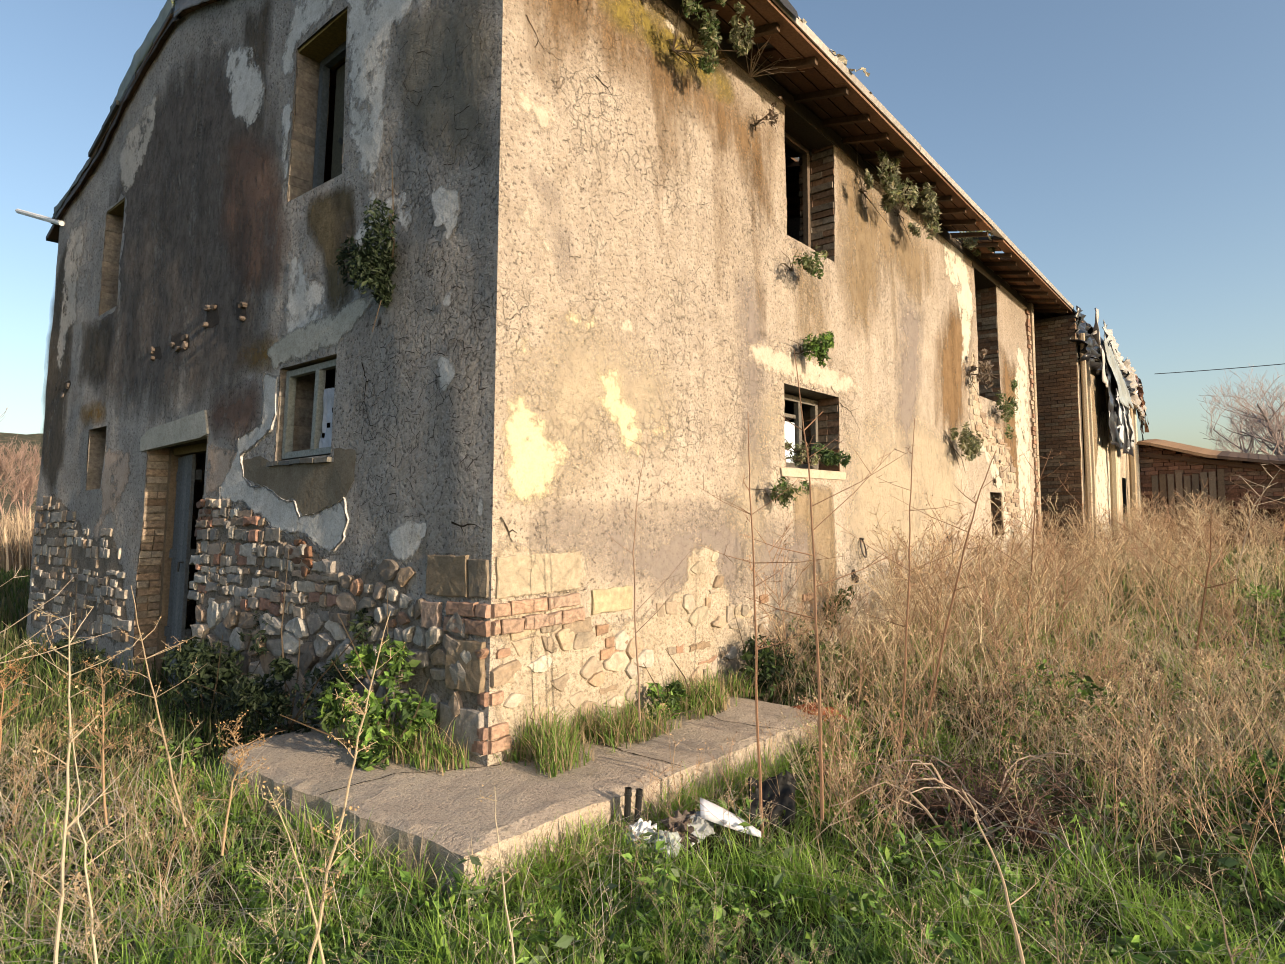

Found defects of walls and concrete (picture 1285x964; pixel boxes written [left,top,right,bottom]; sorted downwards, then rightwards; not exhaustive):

peeling [119,95,157,192]
peeling [225,47,265,127]
water stain [245,0,270,79]
peeling [281,0,426,245]
water stain [541,0,763,195]
peeling [431,186,460,239]
water stain [42,60,282,489]
peeling [194,257,381,577]
peeling [502,397,568,502]
peeling [598,369,666,456]
peeling [389,521,427,560]
flaking render [443,591,628,660]